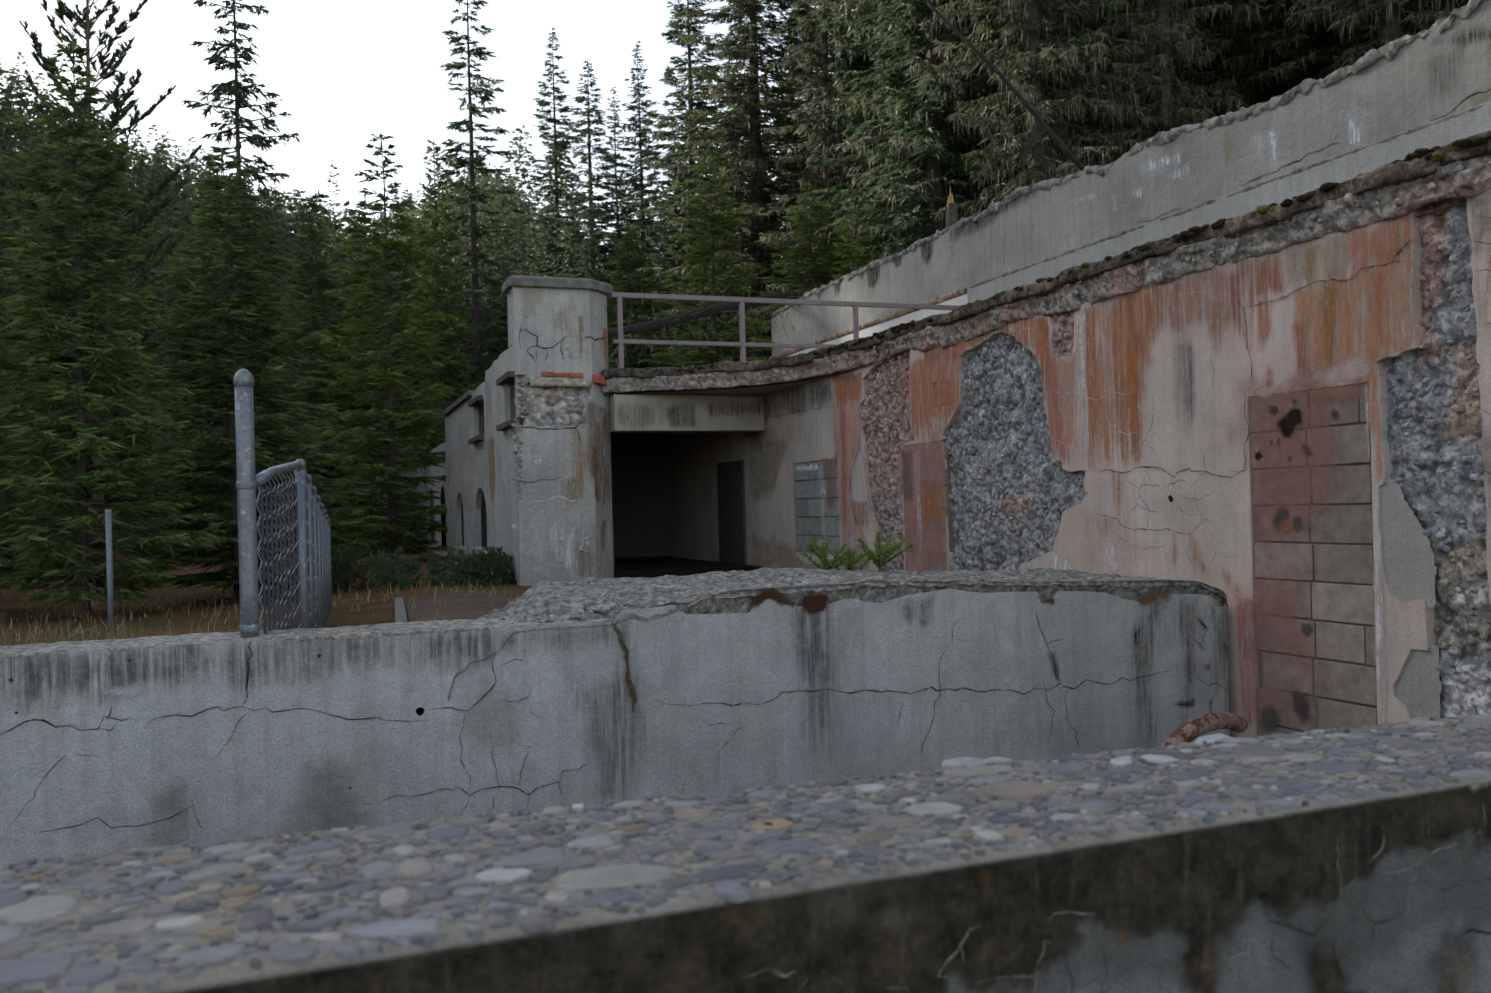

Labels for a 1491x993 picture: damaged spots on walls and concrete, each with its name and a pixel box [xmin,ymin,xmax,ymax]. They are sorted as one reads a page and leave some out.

rust [909,214,1412,504]
spalling [512,376,527,499]
spalling [602,154,1491,721]
crack [1,643,586,832]
crack [614,625,637,709]
rust [753,588,829,613]
crack [688,614,1150,763]
crack [1176,617,1230,706]